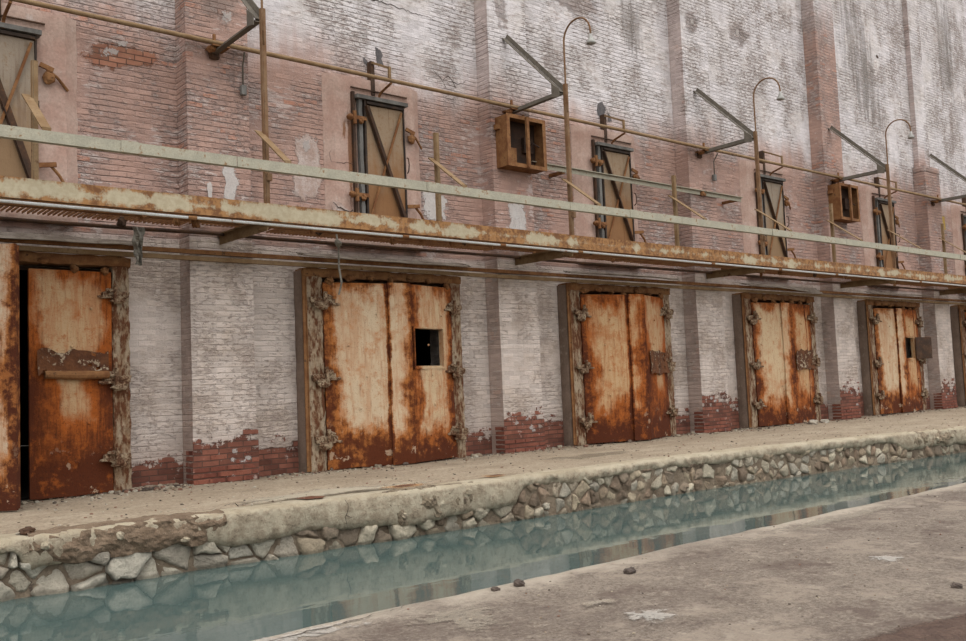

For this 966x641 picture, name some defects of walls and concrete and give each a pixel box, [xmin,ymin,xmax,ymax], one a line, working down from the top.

peeling [81,41,158,71]
peeling [131,429,299,488]
peeling [465,427,492,456]
peeling [504,406,564,453]
peeling [676,408,691,435]
peeling [702,391,740,433]